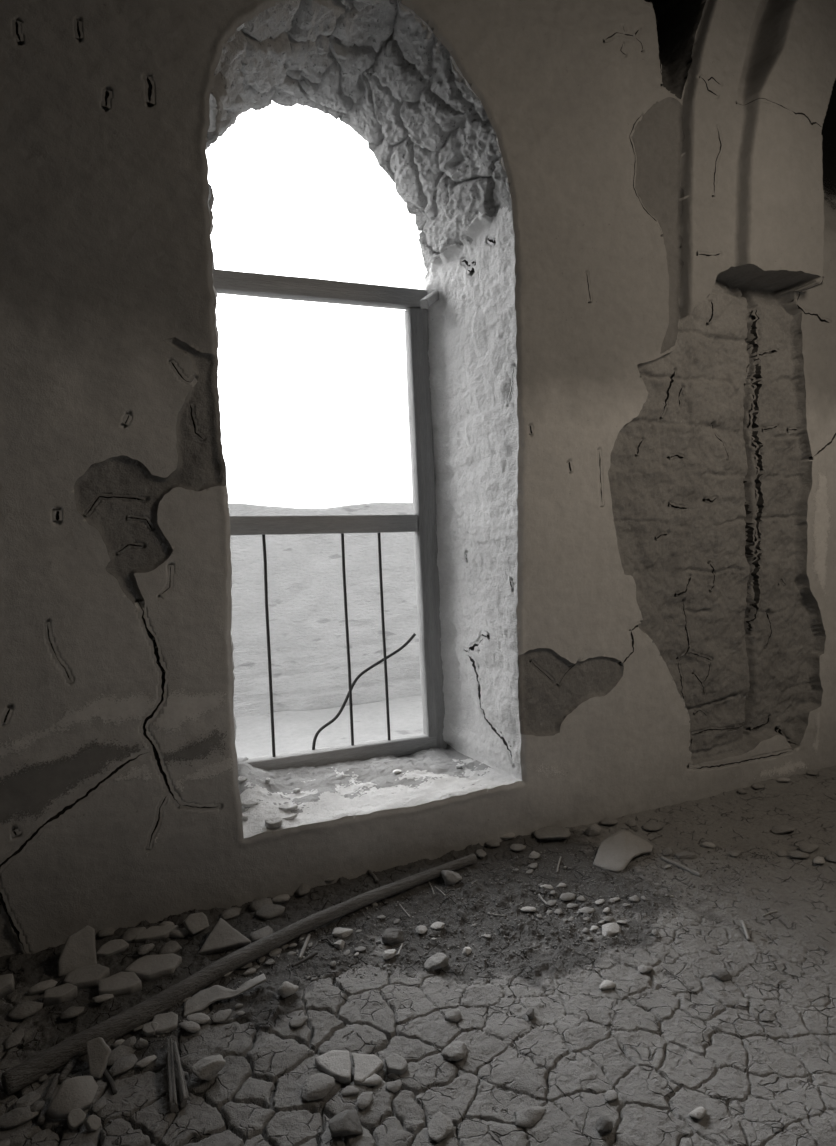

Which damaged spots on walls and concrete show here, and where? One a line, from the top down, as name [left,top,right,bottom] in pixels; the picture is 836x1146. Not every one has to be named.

flaking render [74,337,227,608]
flaking render [608,0,826,765]
crack [0,565,221,954]
crack [464,631,514,764]
flaking render [518,648,624,736]